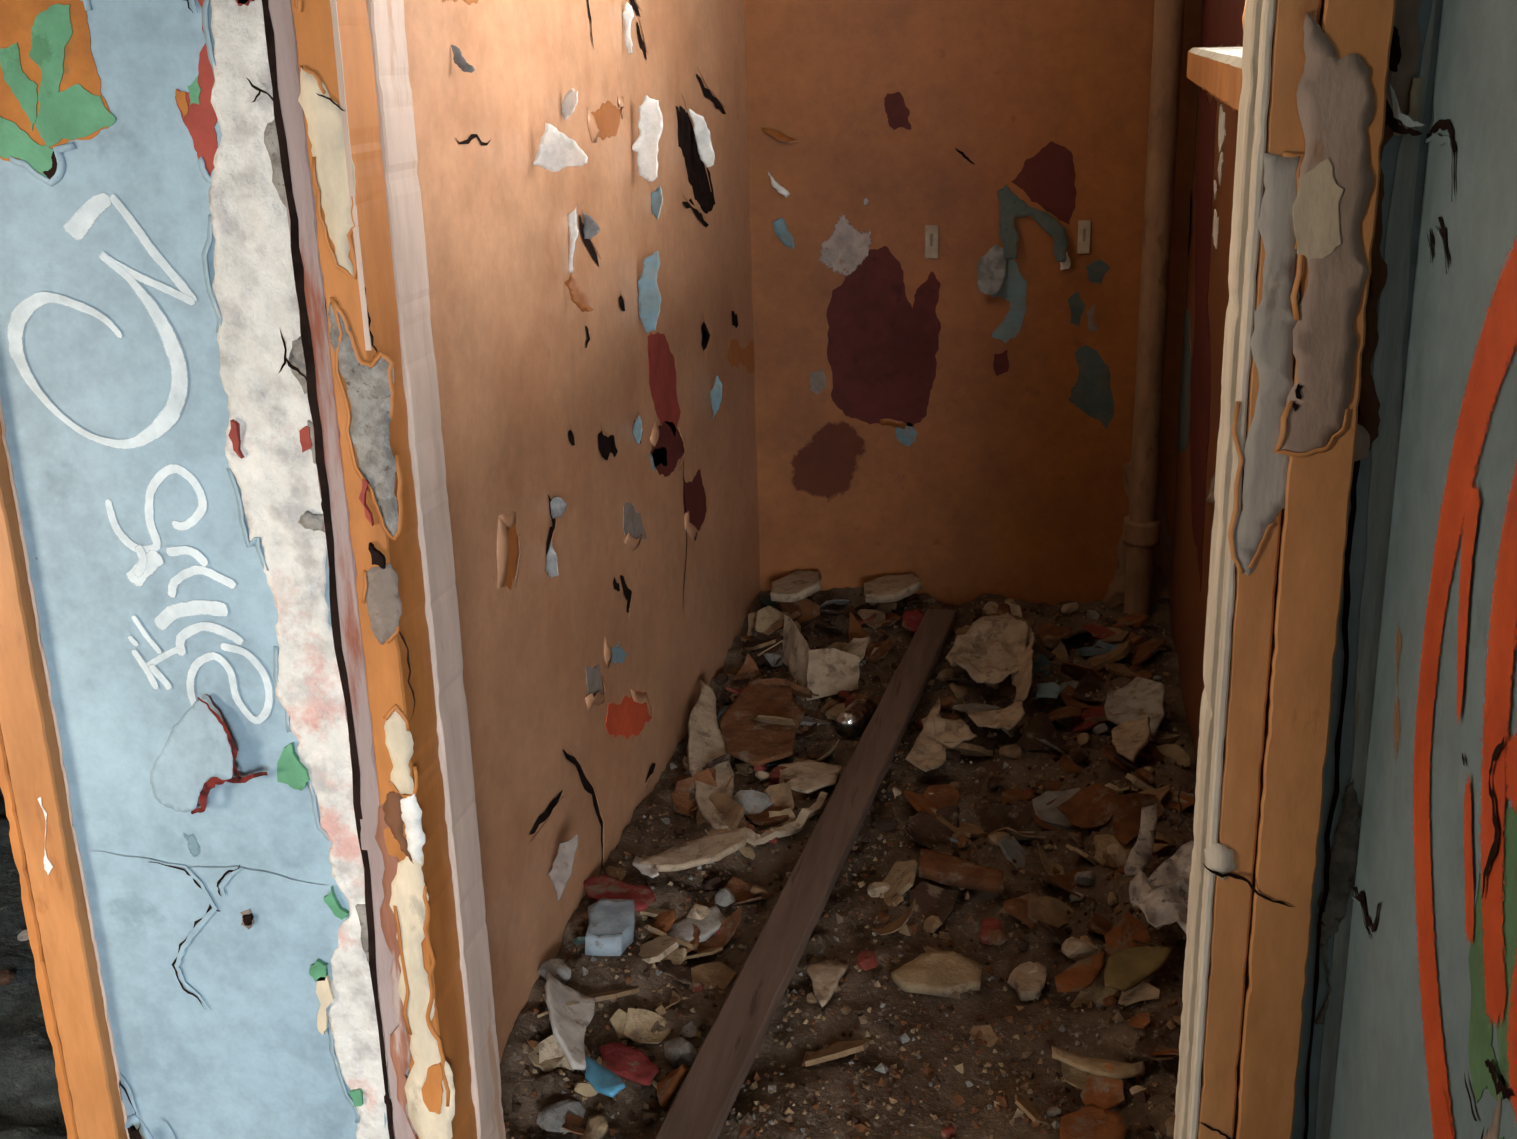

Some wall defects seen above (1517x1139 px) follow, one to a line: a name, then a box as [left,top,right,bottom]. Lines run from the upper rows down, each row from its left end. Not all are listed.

peeling [0,0,117,187]
peeling [533,88,715,220]
peeling [633,251,707,541]
peeling [809,246,941,446]
peeling [977,141,1114,429]
peeling [1200,0,1246,47]
peeling [1228,0,1424,576]
crack [1385,84,1456,274]
spalling [175,0,455,1139]
crack [99,851,322,1010]
crack [1199,460,1380,1139]
peeling [1468,807,1517,1139]